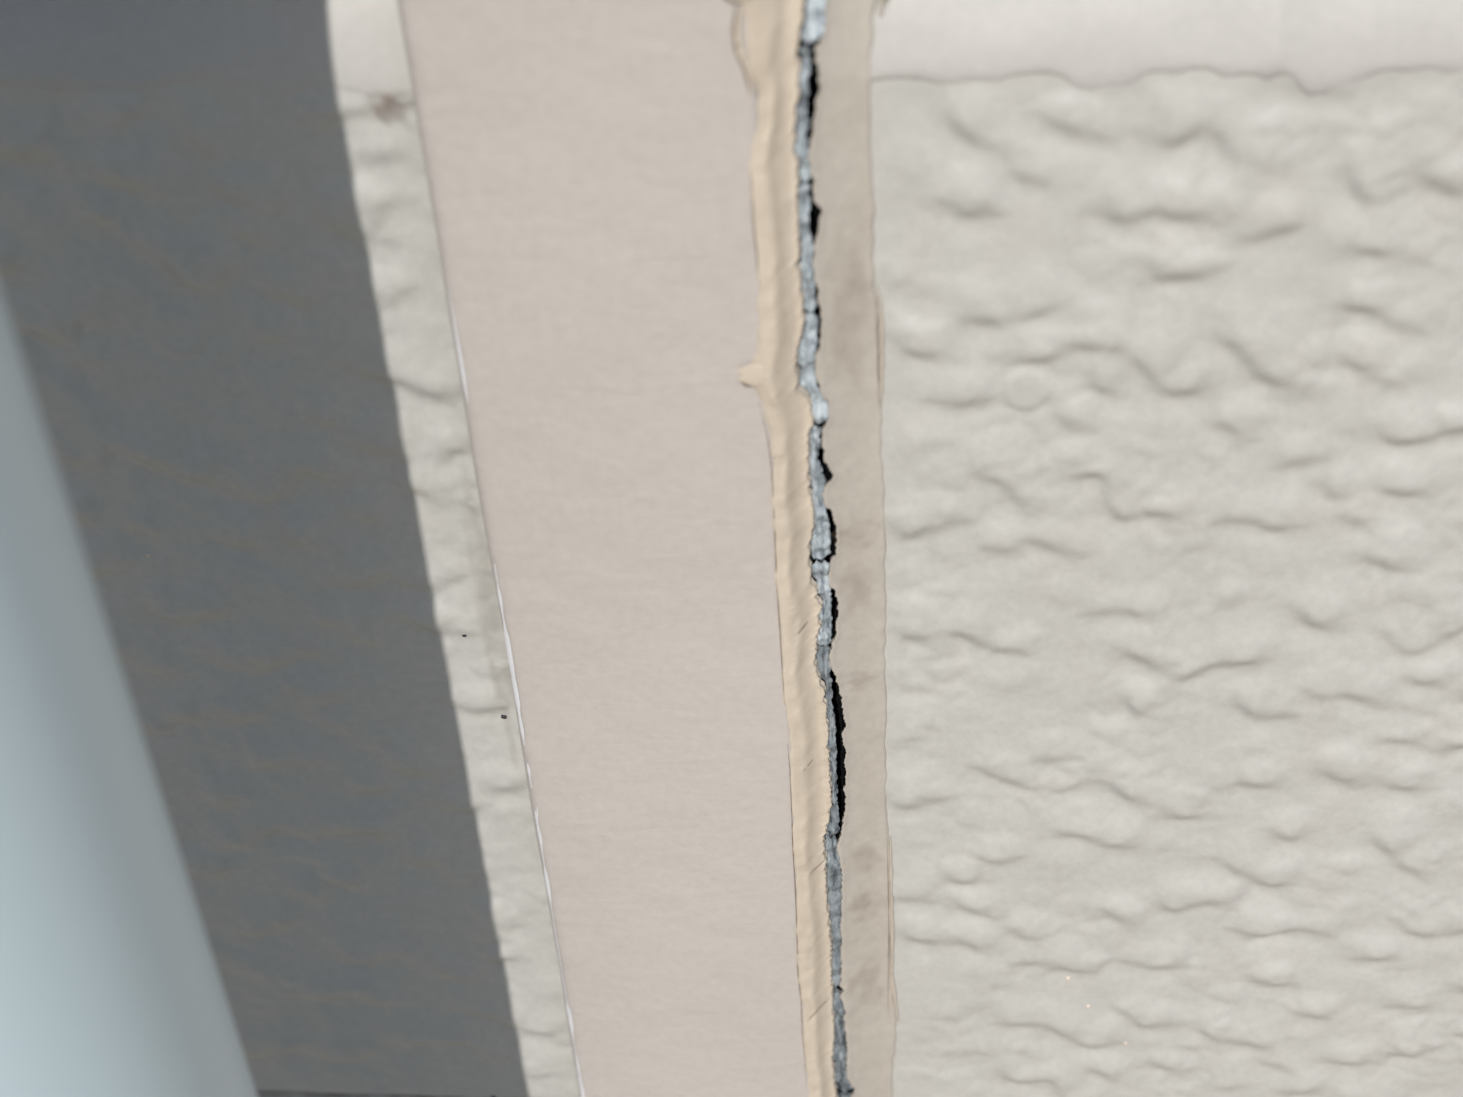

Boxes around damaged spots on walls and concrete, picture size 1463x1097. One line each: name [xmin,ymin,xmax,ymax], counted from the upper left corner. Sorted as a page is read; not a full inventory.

crack [759,0,854,1097]